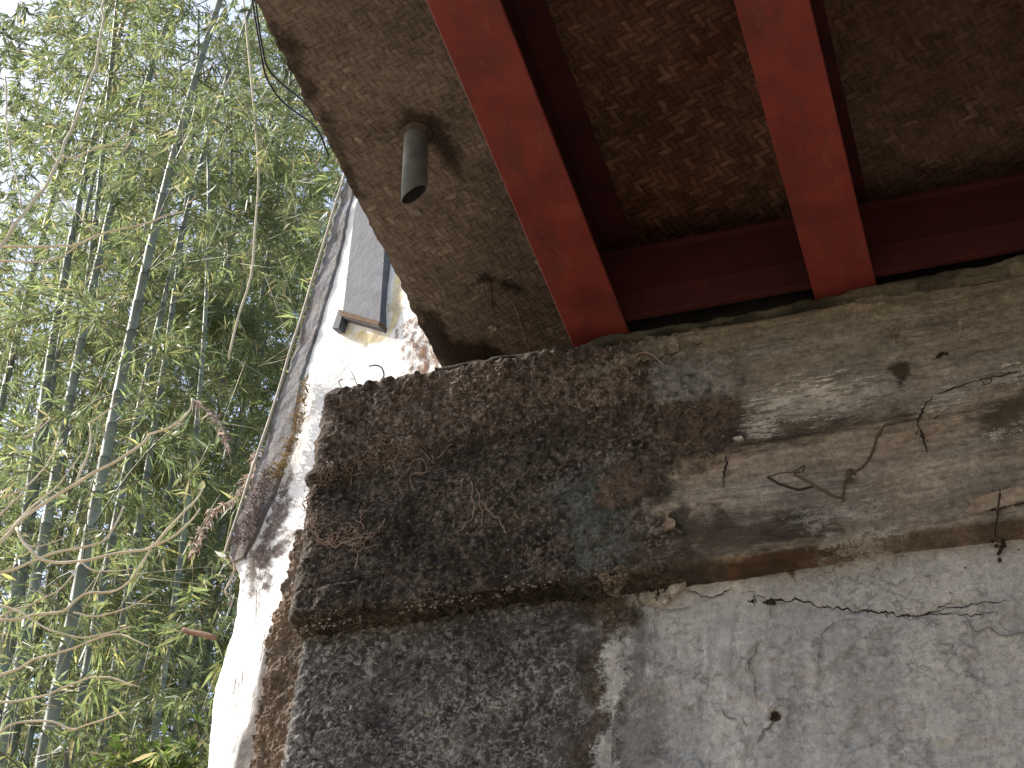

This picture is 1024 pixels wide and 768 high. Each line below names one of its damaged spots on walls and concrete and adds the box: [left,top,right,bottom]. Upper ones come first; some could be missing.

leakage [400,111,460,173]
crack [882,370,1023,454]
spalling [639,582,687,609]
crack [661,586,1024,675]
leakage [564,593,655,768]
crack [720,640,758,726]